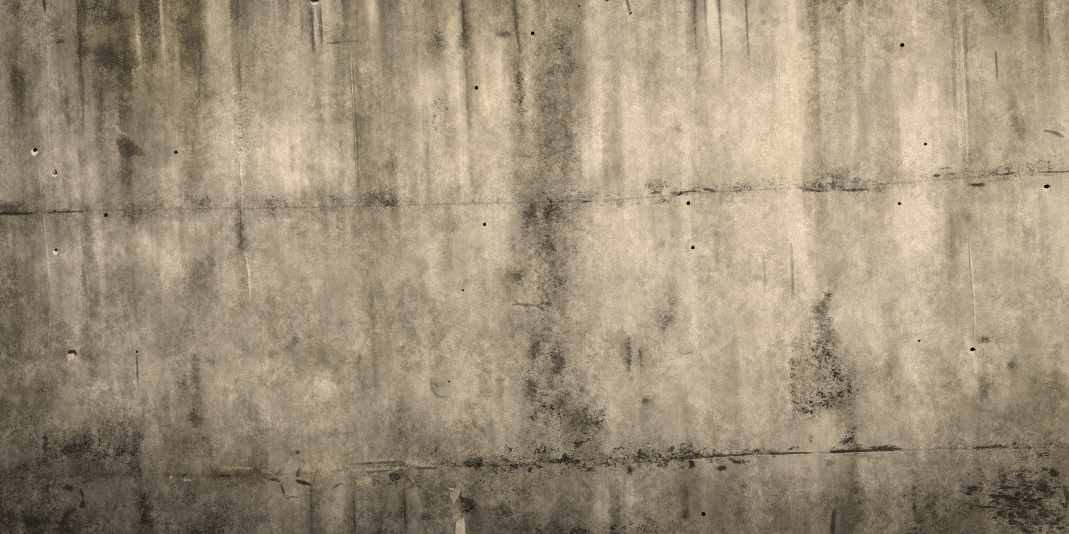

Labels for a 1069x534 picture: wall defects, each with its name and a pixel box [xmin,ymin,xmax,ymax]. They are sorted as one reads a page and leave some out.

water stain [76,0,131,80]
water stain [526,335,581,426]
mould [792,294,858,414]